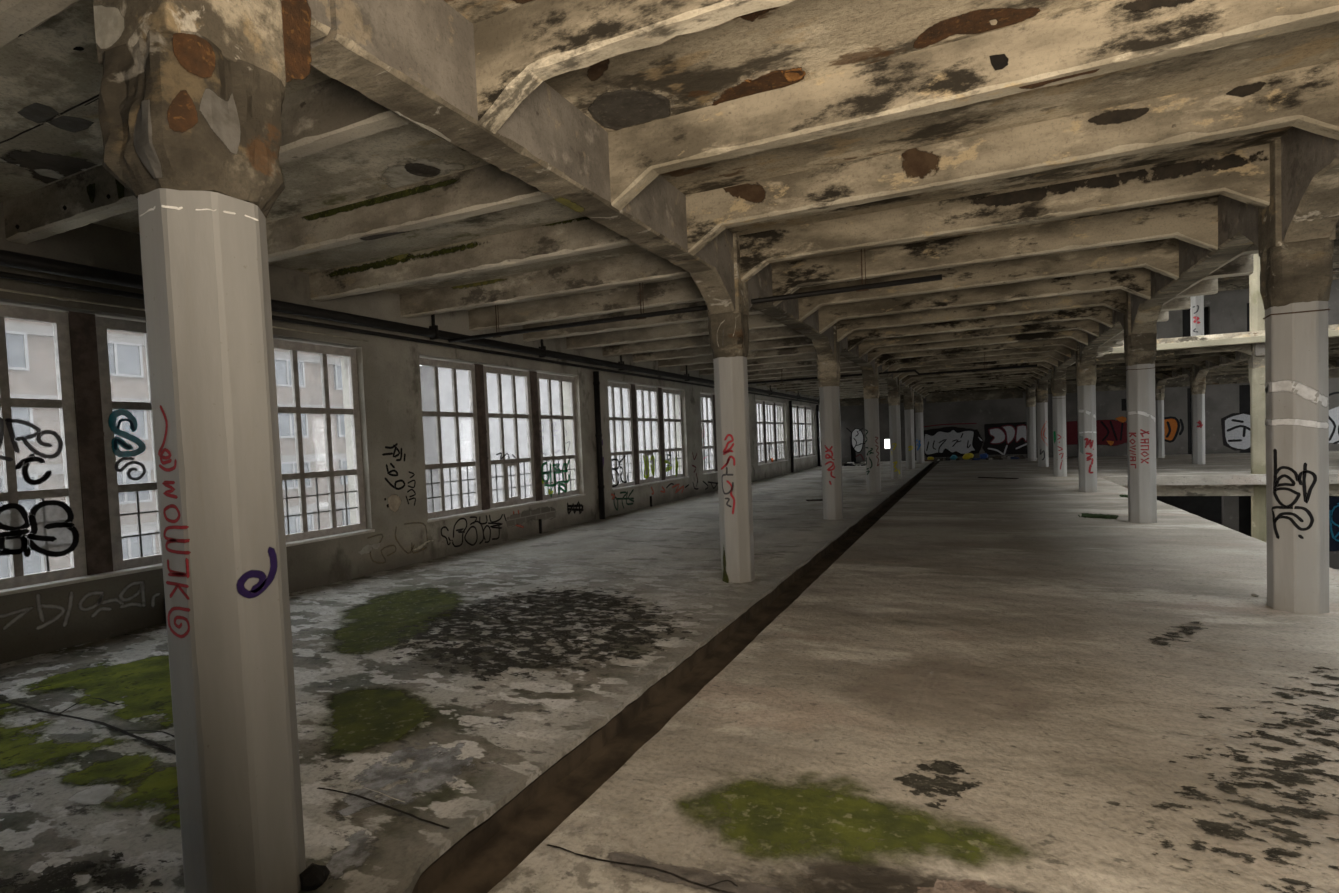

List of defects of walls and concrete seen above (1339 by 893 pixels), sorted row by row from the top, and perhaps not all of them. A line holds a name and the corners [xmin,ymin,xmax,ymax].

peeling [93,5,125,49]
rust [913,7,1040,49]
spalling [167,33,241,154]
spalling [133,100,163,179]
spalling [383,158,477,188]
rust [902,148,941,179]
peeling [140,205,259,221]